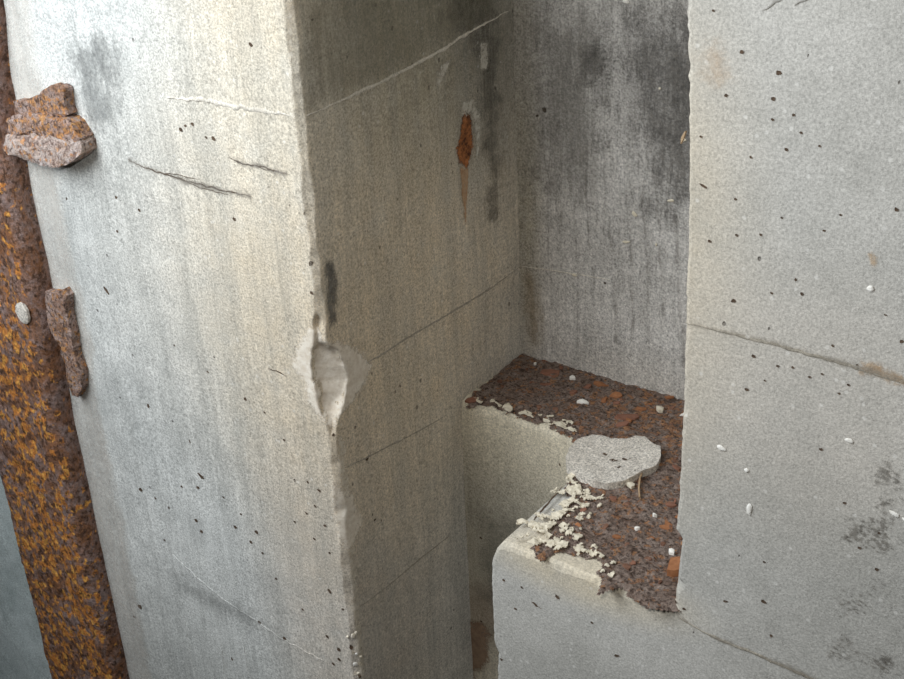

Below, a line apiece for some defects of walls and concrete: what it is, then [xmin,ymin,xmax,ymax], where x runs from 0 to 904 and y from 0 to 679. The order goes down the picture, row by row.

crack [129,160,251,197]
crack [229,157,285,174]
corrosion [456,99,480,221]
water stain [623,7,691,222]
spalling [292,321,372,436]
spalling [332,485,363,550]
corrosion [465,353,685,612]